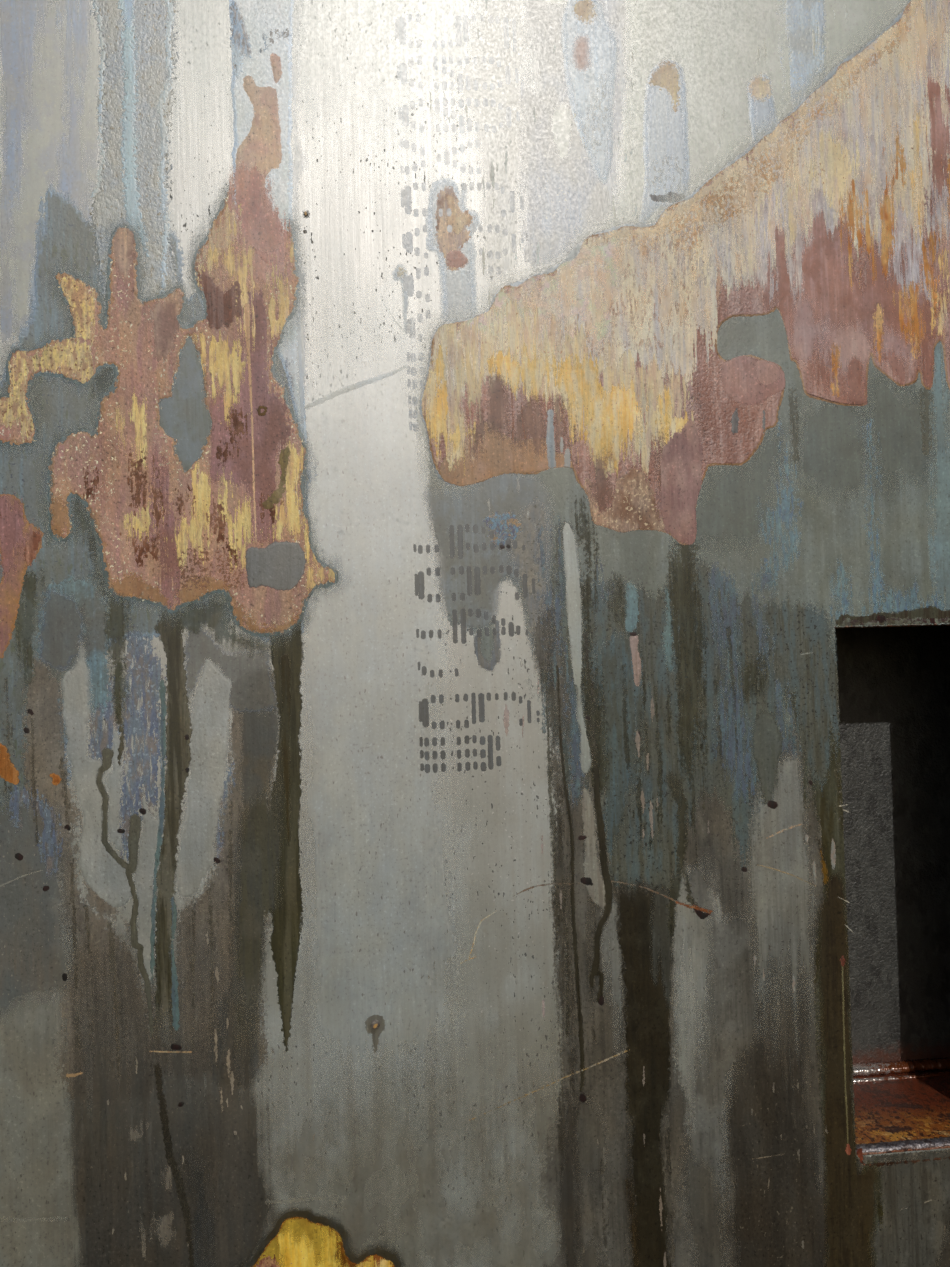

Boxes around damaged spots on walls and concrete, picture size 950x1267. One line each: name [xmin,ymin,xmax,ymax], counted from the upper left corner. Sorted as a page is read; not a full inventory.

spalling [482,140,511,210]
corrosion [0,743,20,785]
damp [0,283,950,1267]
corrosion [845,1144,950,1167]